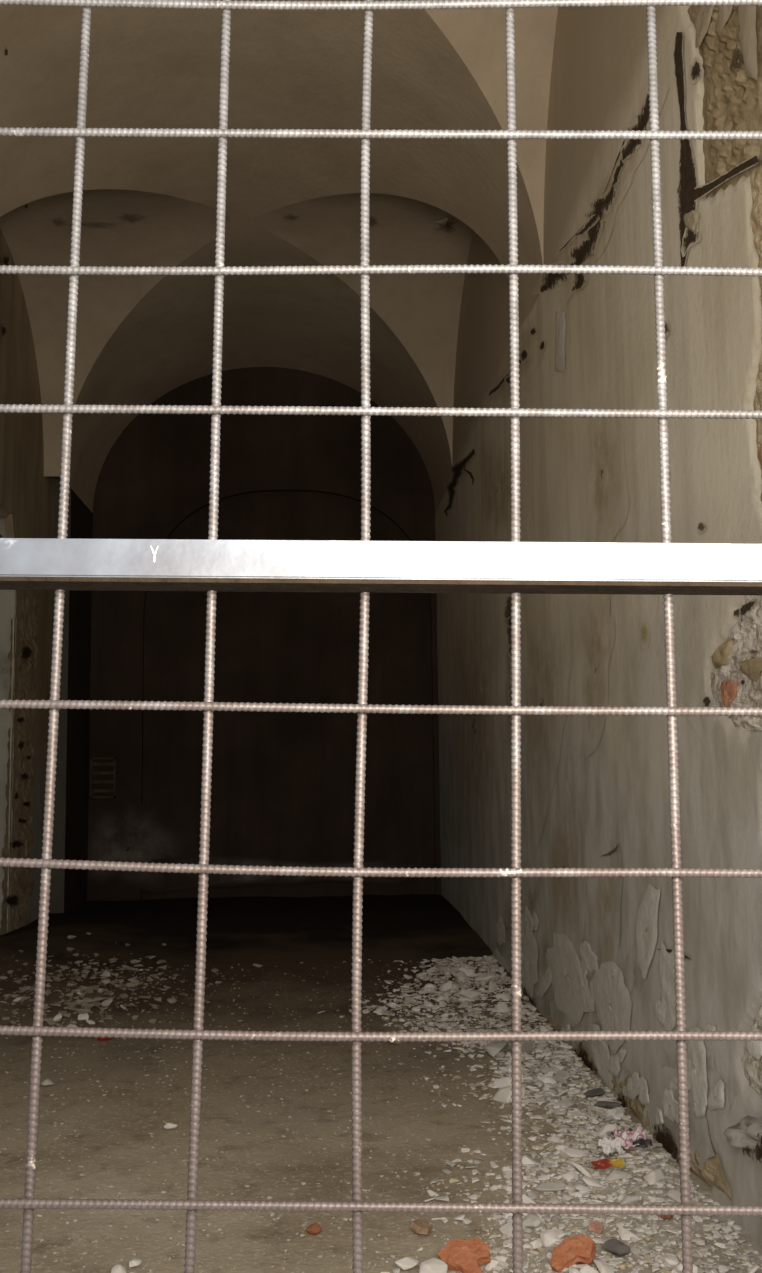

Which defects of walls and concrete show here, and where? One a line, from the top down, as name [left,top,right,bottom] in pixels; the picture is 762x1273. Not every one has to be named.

crack [539,32,759,293]
spalling [687,5,762,305]
spalling [753,334,762,477]
spalling [703,595,762,731]
peeling [493,883,732,1201]
spalling [741,1004,762,1096]
spalling [743,1133,762,1162]